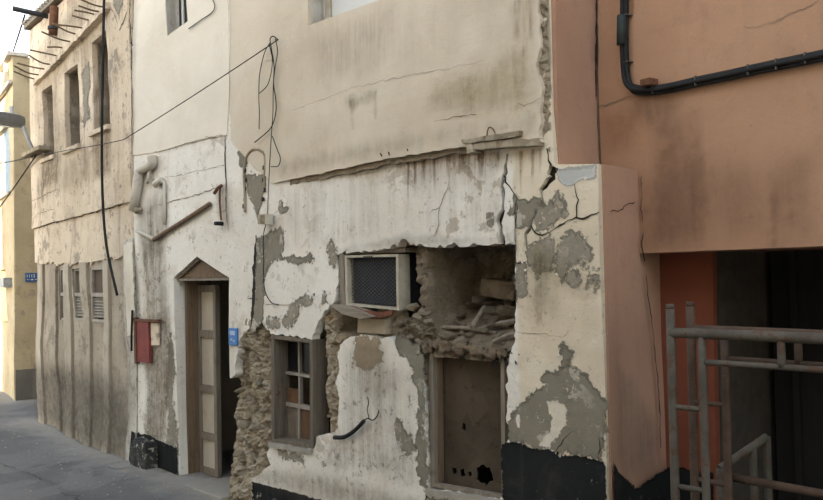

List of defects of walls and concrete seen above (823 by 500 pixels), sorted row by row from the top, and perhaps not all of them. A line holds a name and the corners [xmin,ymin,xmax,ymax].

peeling [237,148,266,220]
peeling [248,226,328,333]
peeling [326,238,338,268]
crack [430,160,452,239]
spalling [346,165,609,500]
crack [500,148,661,447]